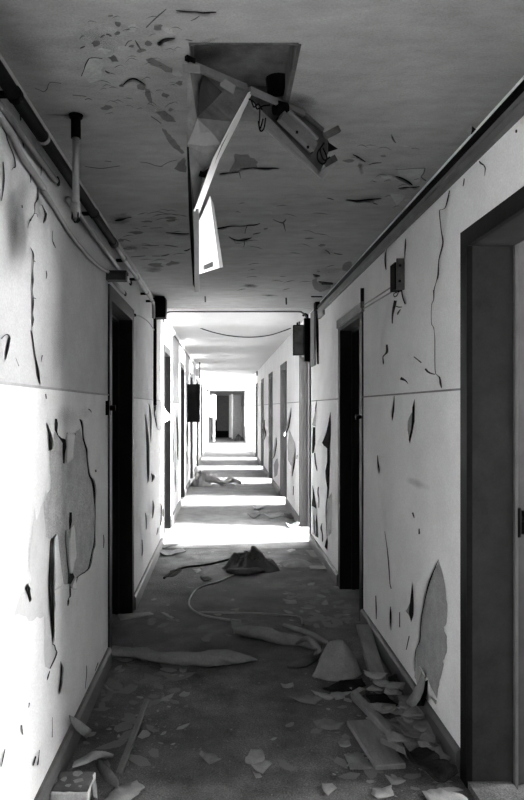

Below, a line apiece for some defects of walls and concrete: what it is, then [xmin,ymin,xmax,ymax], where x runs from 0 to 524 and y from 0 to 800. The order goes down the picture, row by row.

peeling [91,15,183,89]
peeling [101,77,187,172]
crack [327,197,381,205]
crack [30,247,47,327]
crack [414,179,465,388]
peeling [145,400,188,489]
flaking render [284,408,296,476]
peeling [312,401,332,549]
peeling [14,419,97,692]
peeling [413,559,447,704]